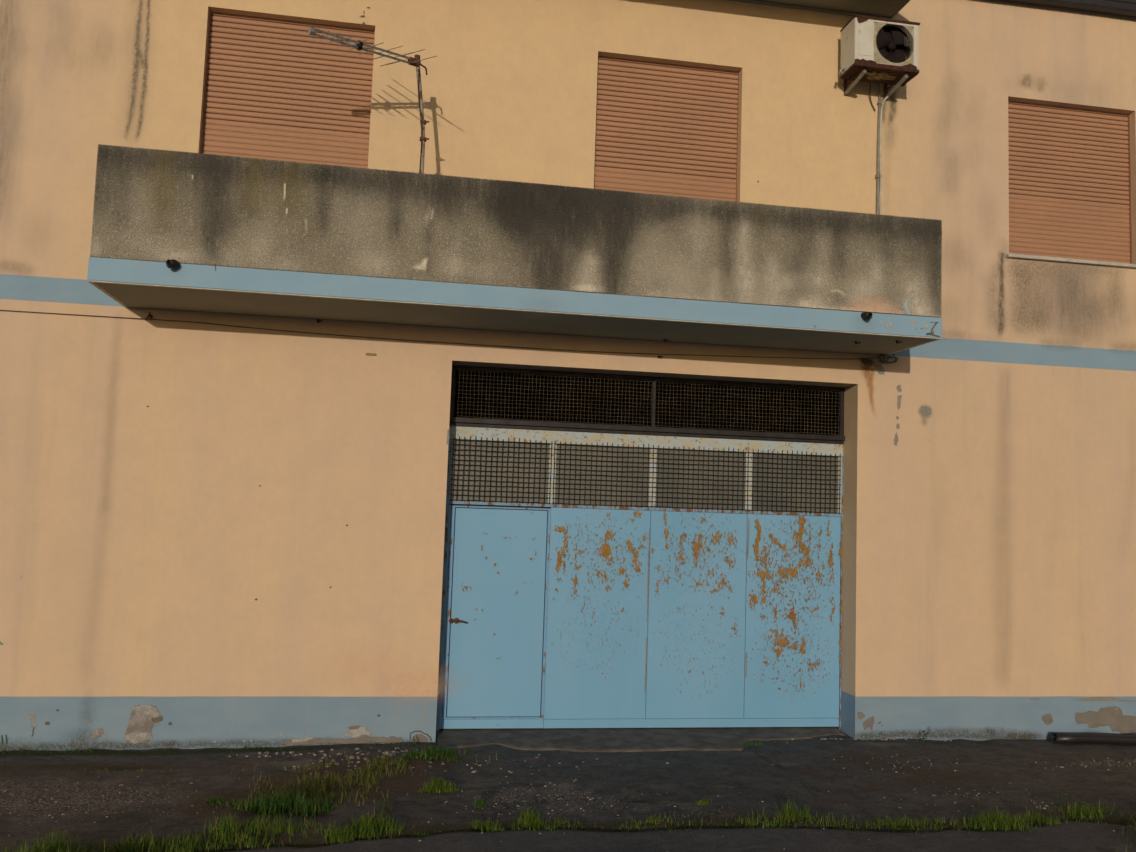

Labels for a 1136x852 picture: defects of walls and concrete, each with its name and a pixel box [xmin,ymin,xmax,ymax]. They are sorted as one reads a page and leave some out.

damp [95,146,942,316]
rust [527,508,843,698]
spalling [124,704,172,744]
peeling [1075,697,1136,735]